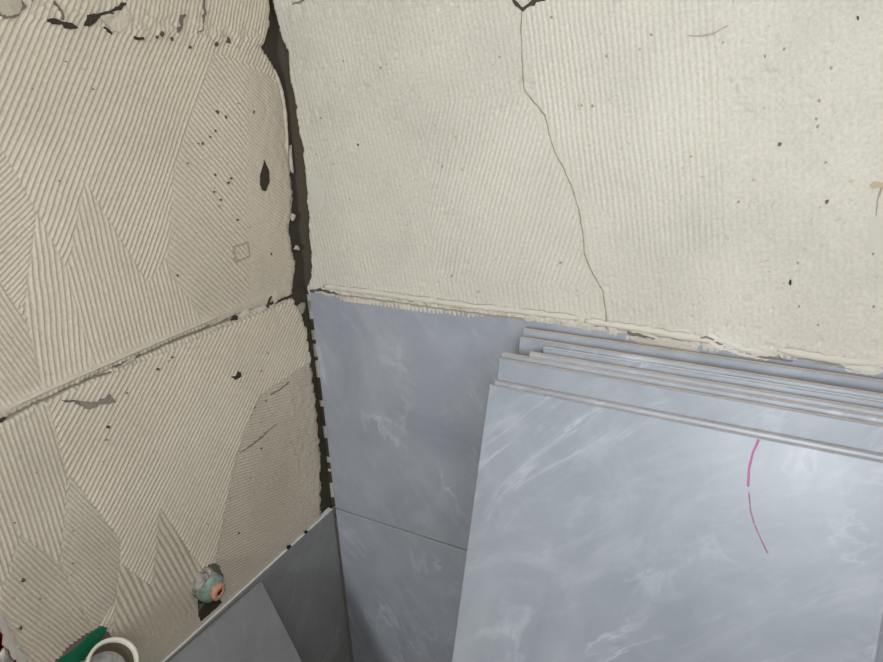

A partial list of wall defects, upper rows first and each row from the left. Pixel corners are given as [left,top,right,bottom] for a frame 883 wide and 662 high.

crack [512,0,655,340]
crack [0,317,232,423]